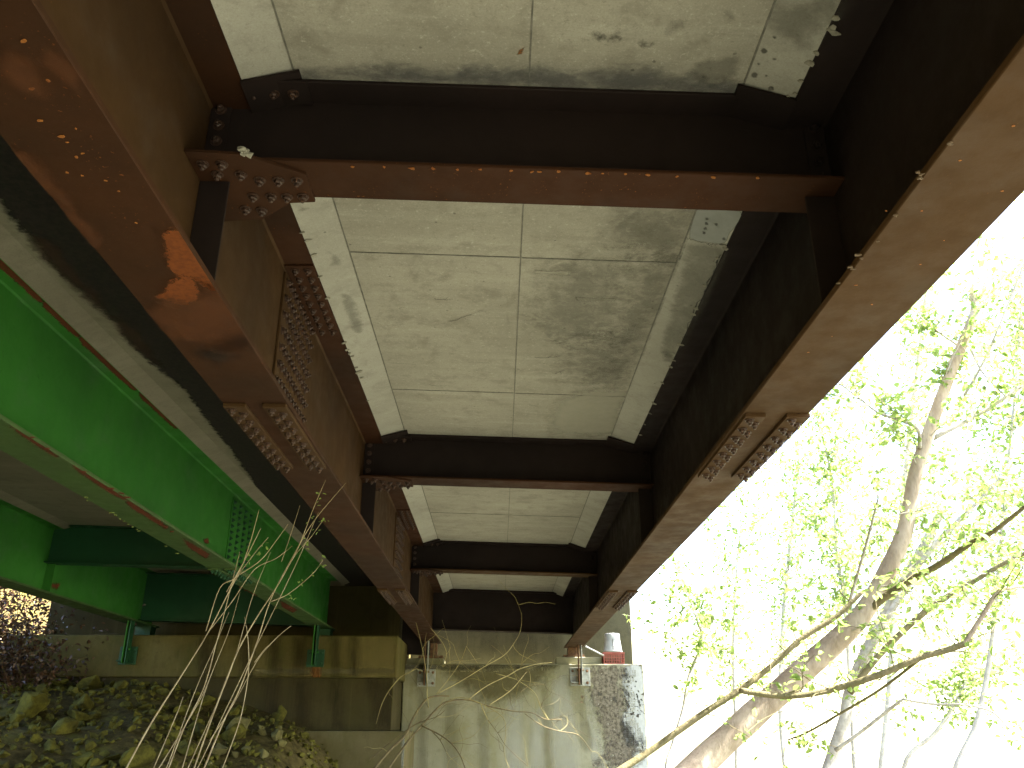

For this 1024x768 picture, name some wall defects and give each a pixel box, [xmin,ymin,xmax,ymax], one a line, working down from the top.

water stain [373,69,736,93]
corrosion [154,228,217,305]
water stain [0,135,375,586]
water stain [622,665,647,768]